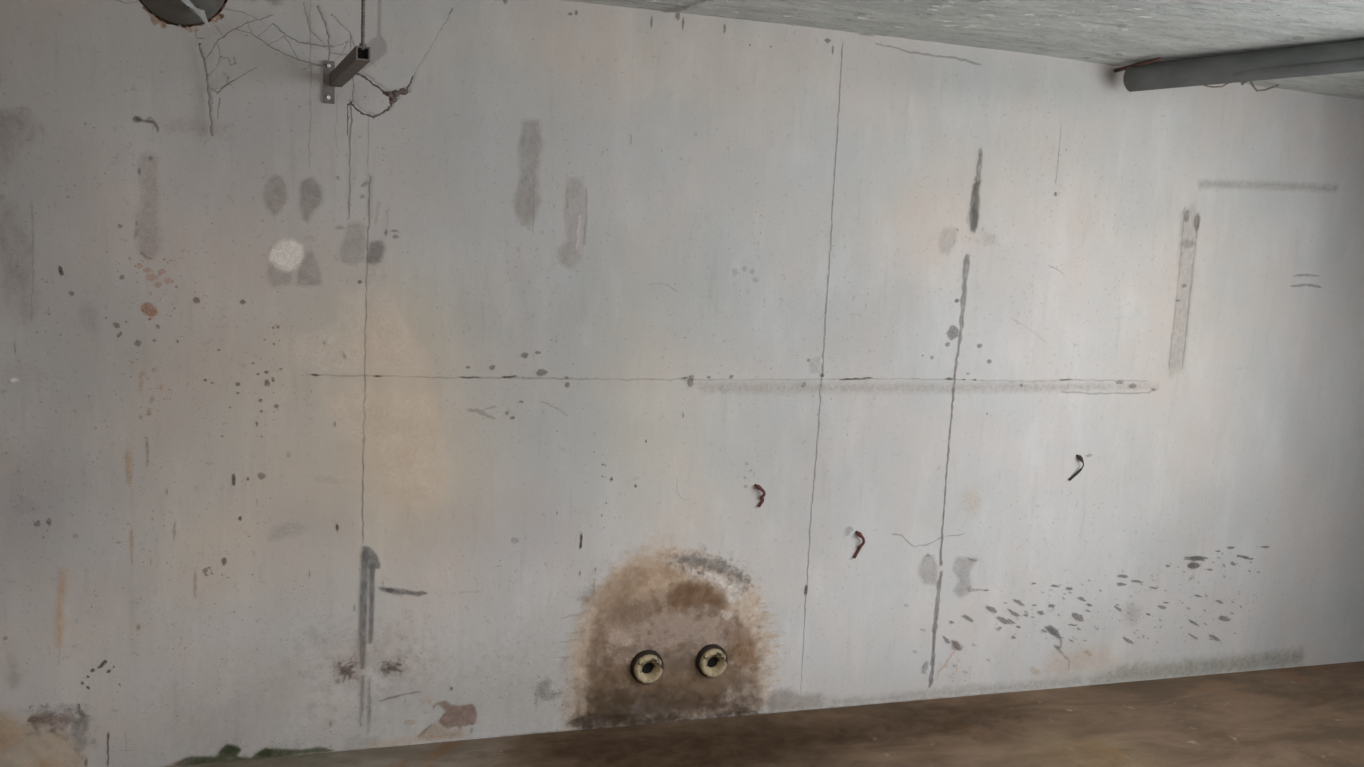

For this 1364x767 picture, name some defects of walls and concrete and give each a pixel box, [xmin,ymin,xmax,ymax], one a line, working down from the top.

leakage [570,554,767,729]